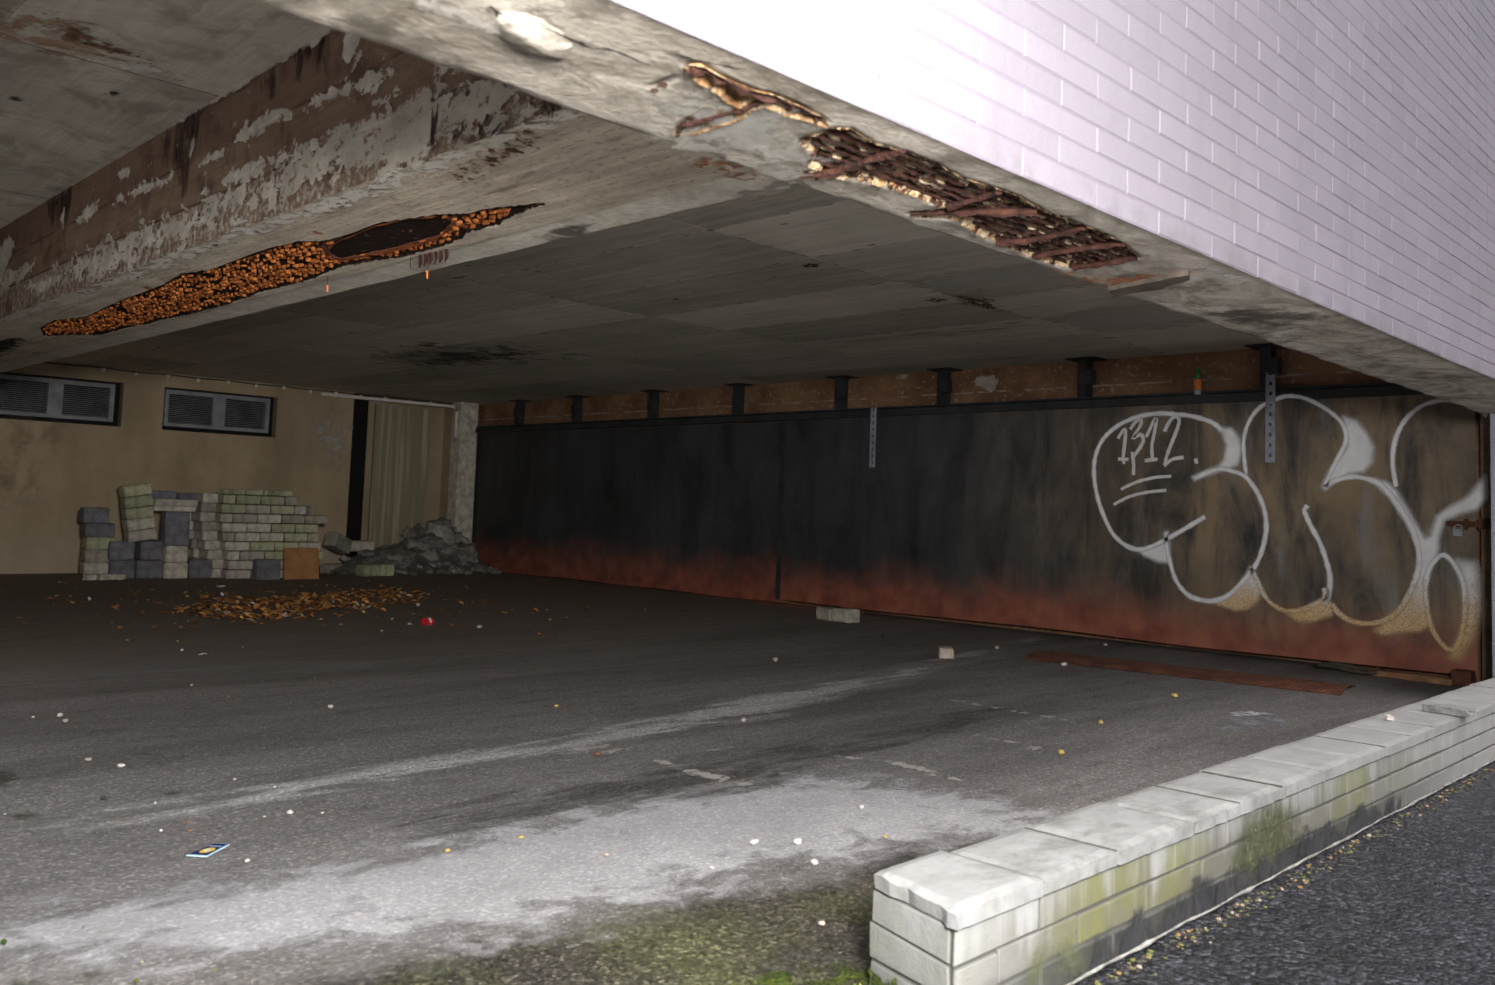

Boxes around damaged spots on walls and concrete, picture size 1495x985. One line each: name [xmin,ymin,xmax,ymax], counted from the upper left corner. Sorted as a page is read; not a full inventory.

water stain [293,38,329,80]
crack [437,0,739,70]
water stain [47,186,71,226]
water stain [160,110,199,198]
spalling [0,29,589,336]
water stain [430,103,438,146]
spalling [647,61,1242,297]